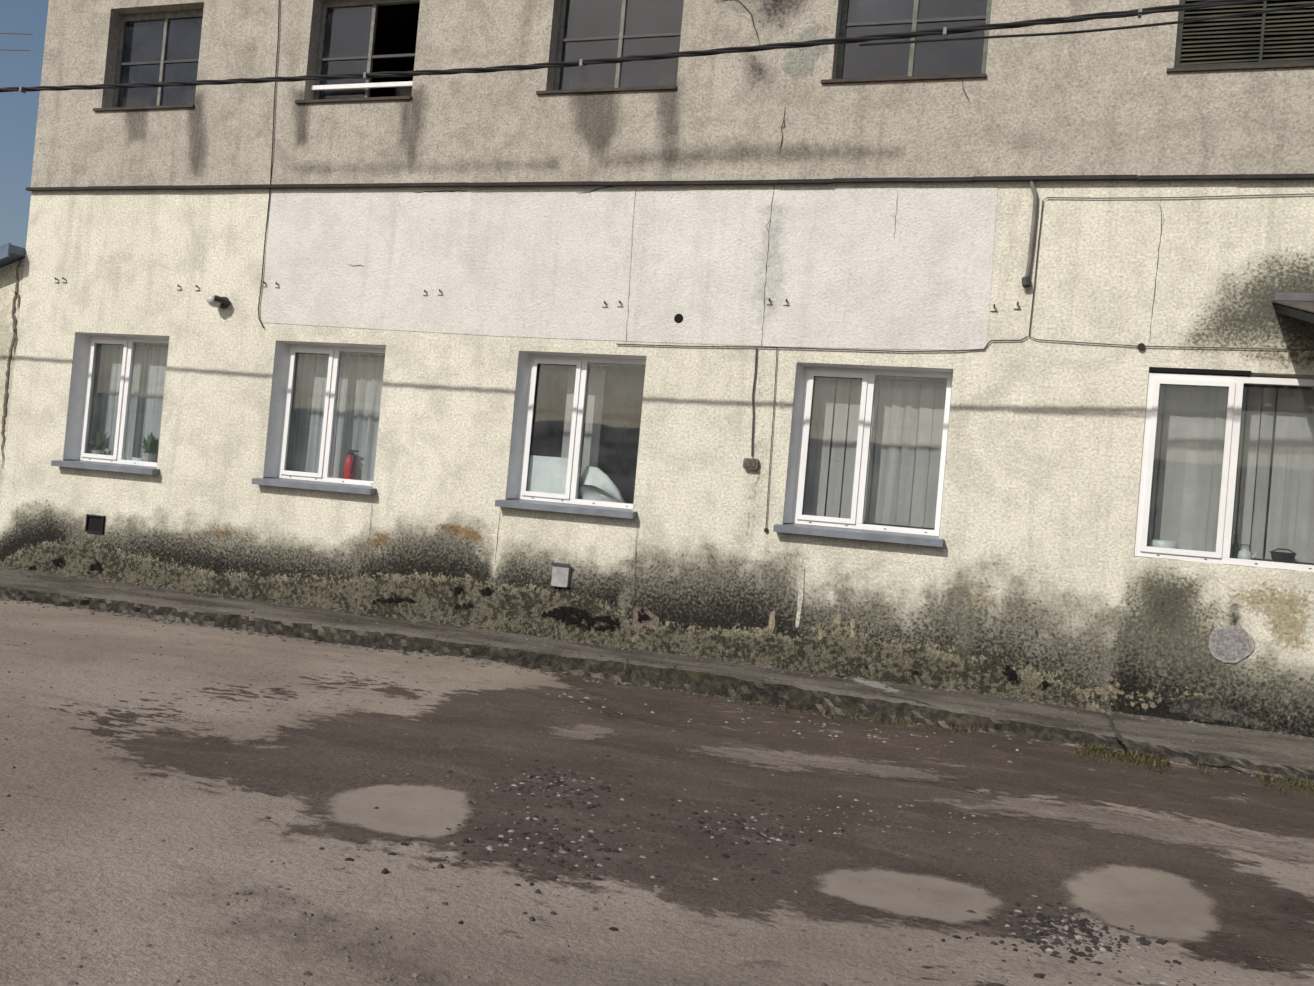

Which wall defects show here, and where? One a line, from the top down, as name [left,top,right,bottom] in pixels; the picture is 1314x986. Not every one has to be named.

crack [715,0,760,44]
peeling [783,28,824,76]
crack [1,245,24,468]
damp [1184,253,1314,367]
damp [0,505,1314,738]